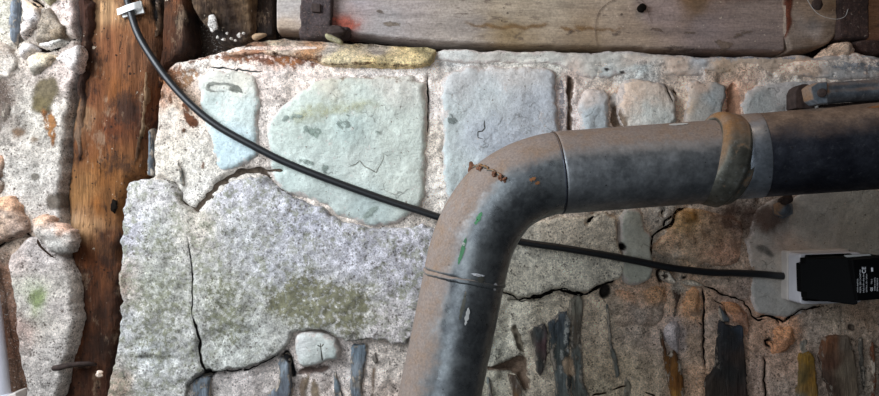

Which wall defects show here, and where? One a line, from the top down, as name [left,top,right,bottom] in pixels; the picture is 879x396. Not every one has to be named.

crack [164,167,283,212]
crack [650,207,685,255]
crack [187,237,277,385]
crack [503,280,615,302]
crack [698,285,821,368]